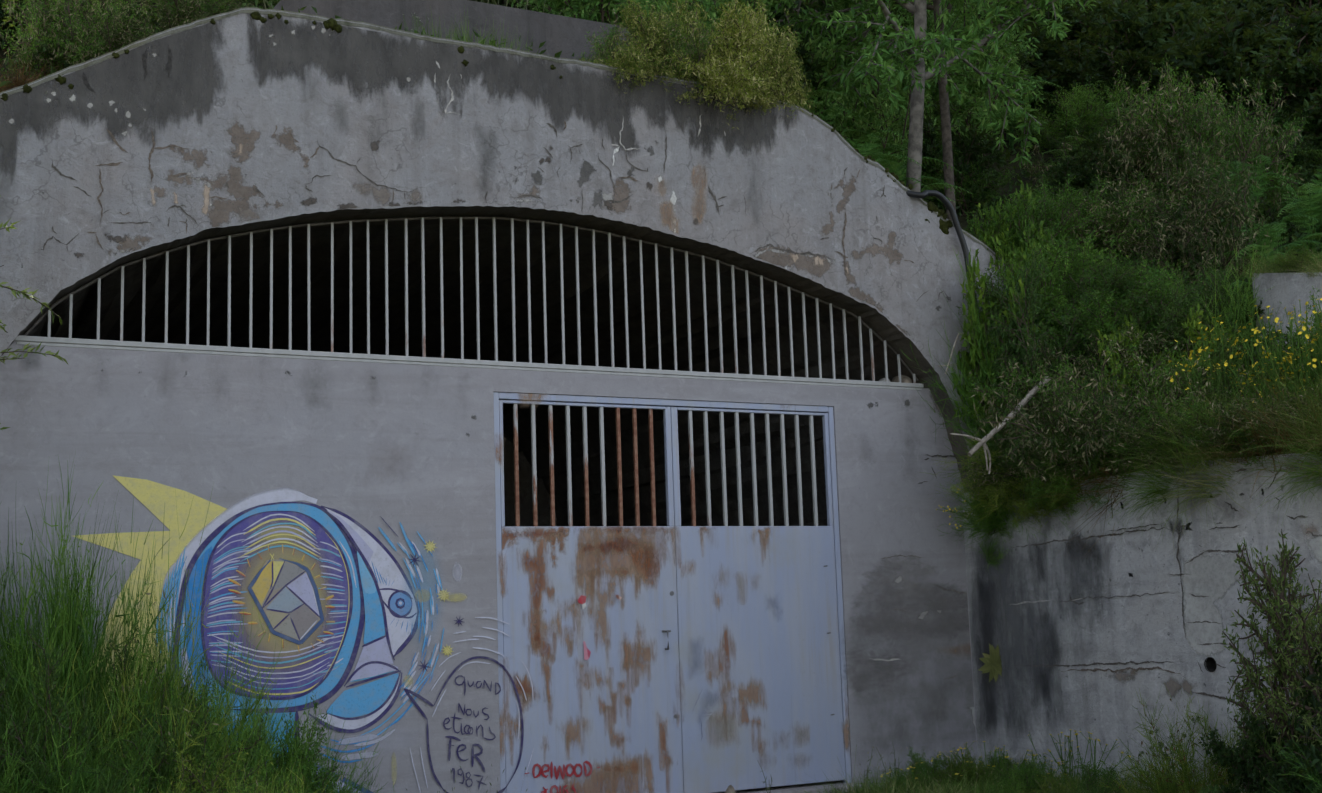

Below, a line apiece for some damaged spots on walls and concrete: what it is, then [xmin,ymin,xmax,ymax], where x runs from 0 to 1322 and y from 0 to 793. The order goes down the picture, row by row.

damp [0,21,222,175]
damp [249,15,798,165]
crack [41,130,196,251]
spalling [150,122,309,227]
corrosion [499,526,693,793]
corrosion [709,630,764,725]
damp [930,546,1061,730]
damp [1065,535,1101,606]
crack [1010,491,1262,708]
crack [1236,469,1322,537]